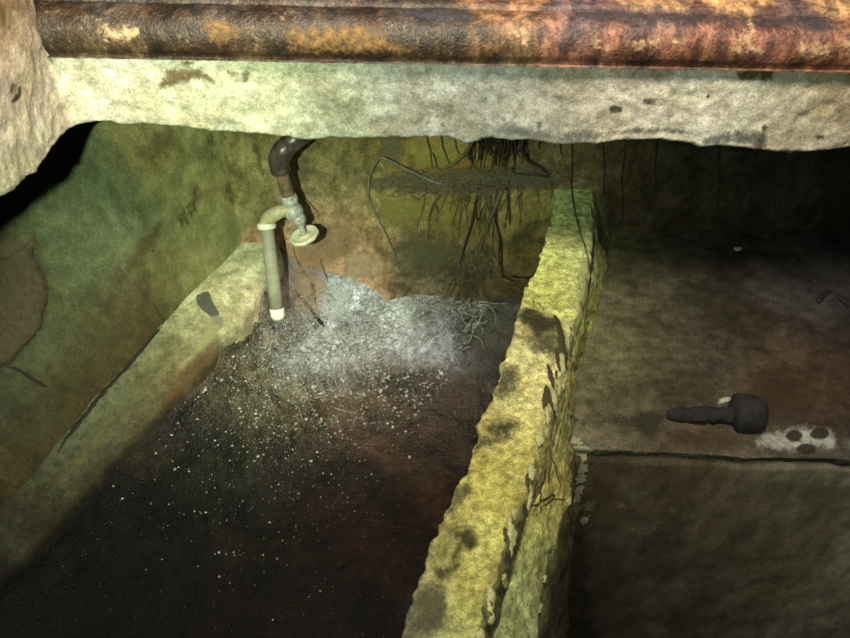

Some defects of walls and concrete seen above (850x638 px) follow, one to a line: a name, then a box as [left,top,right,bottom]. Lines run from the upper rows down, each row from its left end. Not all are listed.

corrosion [102,24,139,42]
corrosion [203,20,241,44]
corrosion [285,25,404,54]
corrosion [633,35,660,51]
corrosion [730,19,763,55]
corrosion [796,42,831,60]
corrosion [161,61,214,87]
water stain [705,109,765,150]
efflorescence [757,428,835,453]